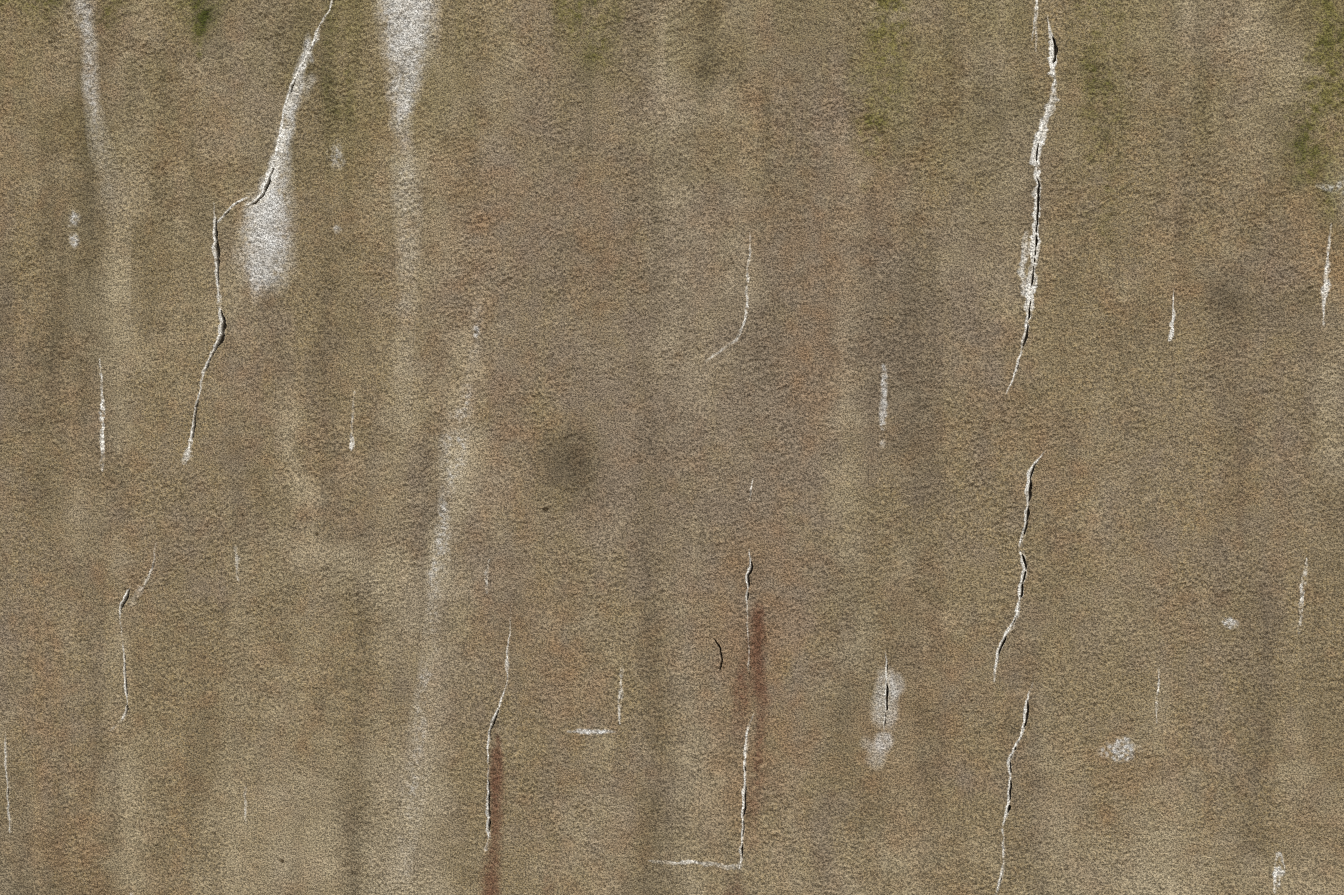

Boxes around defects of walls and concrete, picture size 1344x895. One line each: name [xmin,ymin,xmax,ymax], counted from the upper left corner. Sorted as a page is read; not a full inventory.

leakage [0,0,231,343]
crack [180,0,334,466]
leakage [230,30,319,307]
leakage [369,0,443,449]
leakage [541,0,640,97]
crack [1003,0,1061,397]
crack [110,542,159,733]
crack [483,558,514,853]
crack [647,712,756,872]
crack [702,547,755,674]
rust [720,596,774,895]
crack [992,450,1047,895]